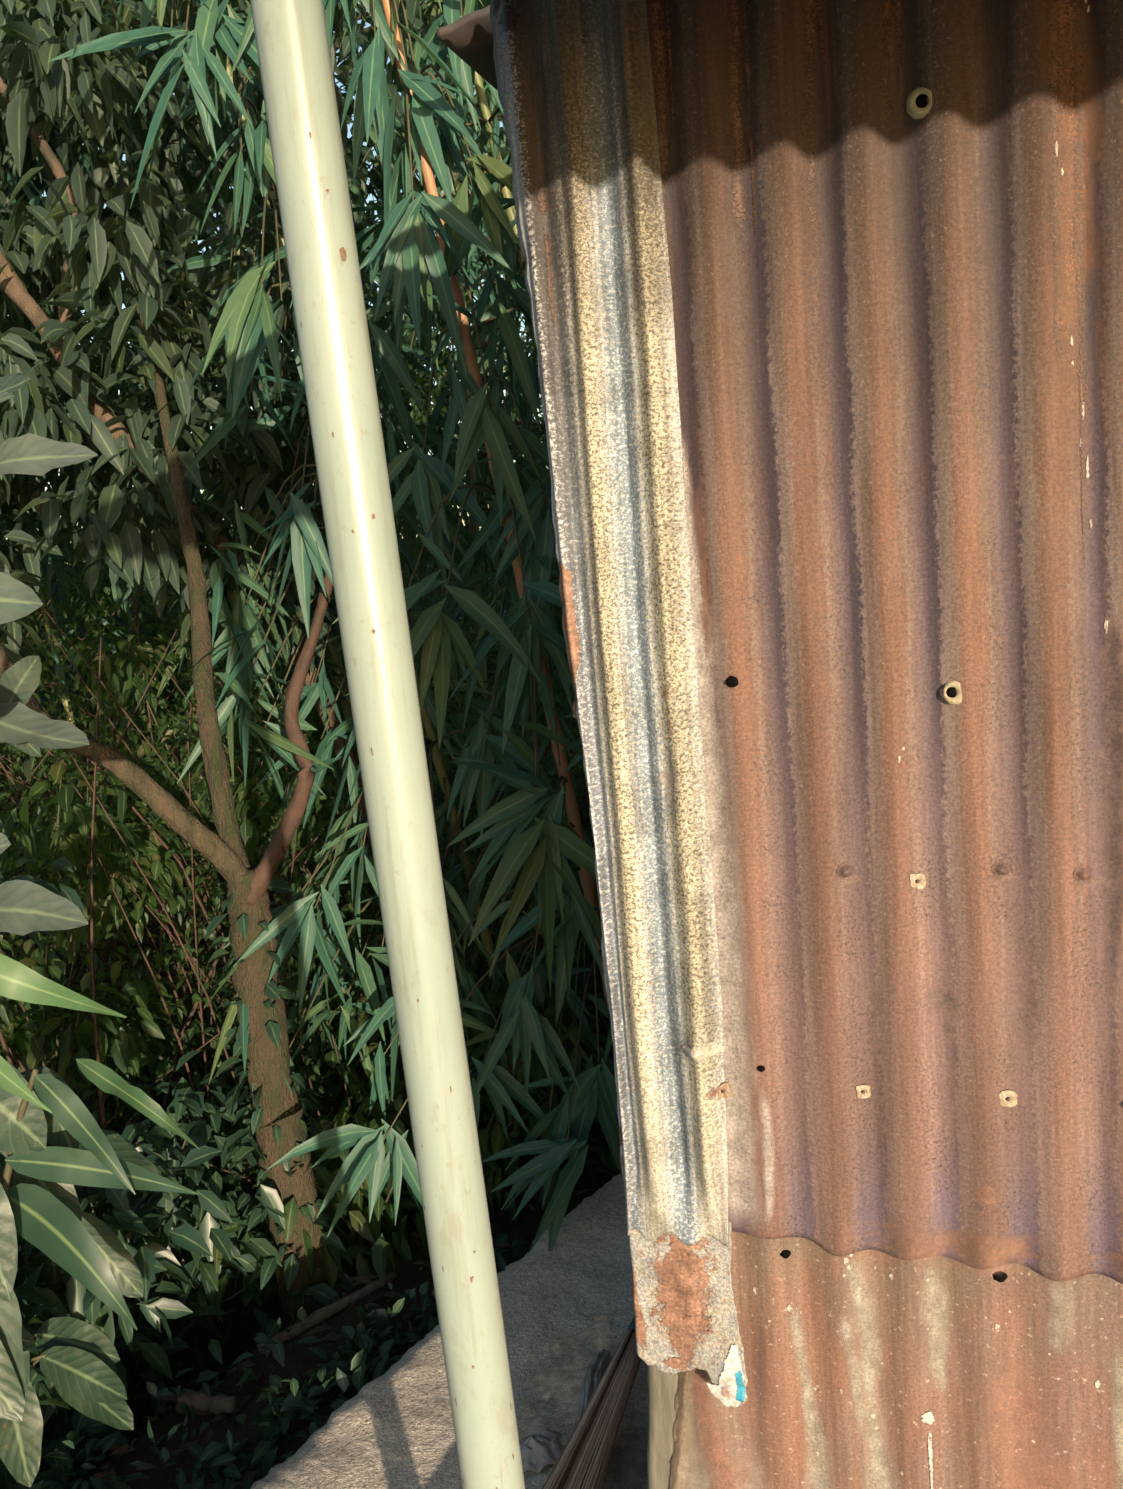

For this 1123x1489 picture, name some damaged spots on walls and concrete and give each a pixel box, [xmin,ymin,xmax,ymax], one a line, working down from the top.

rust [649,0,681,339]
rust [726,0,757,303]
rust [1042,0,1093,560]
rust [682,449,773,1215]
rust [515,1233,739,1489]
damp [791,1312,831,1489]
damp [842,1265,893,1489]
damp [925,1269,948,1385]
damp [1114,1354,1123,1489]